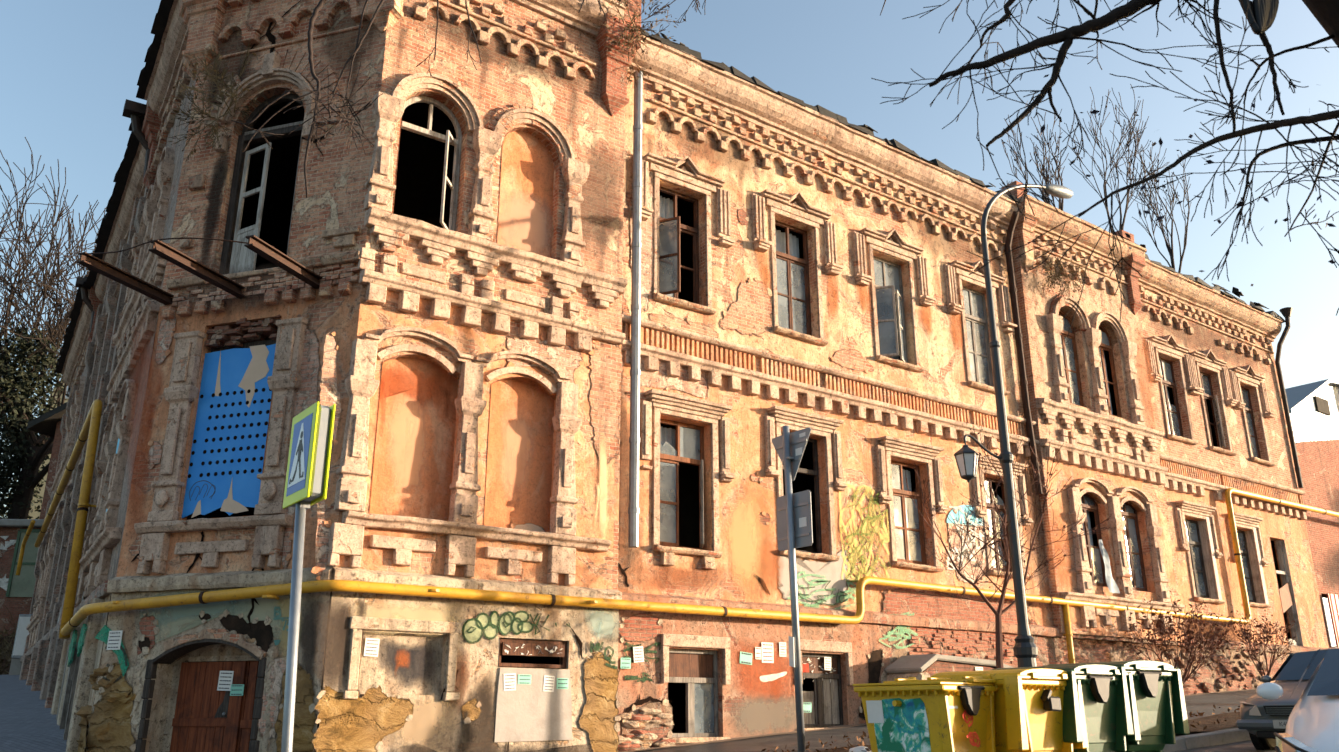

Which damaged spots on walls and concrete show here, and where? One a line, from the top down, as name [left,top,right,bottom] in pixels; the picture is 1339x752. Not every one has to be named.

flaking render [76,614,160,752]
leakage [143,596,284,636]
flaking render [199,609,414,752]
leakage [300,601,453,688]
flaking render [579,652,676,752]
spalling [618,613,663,643]